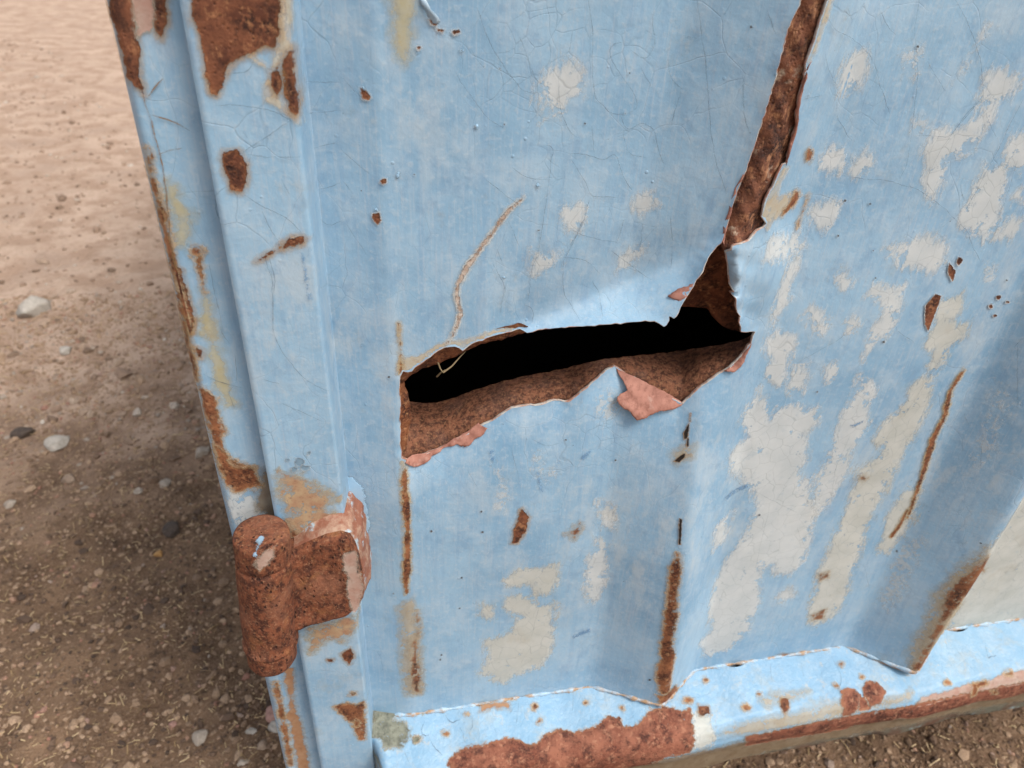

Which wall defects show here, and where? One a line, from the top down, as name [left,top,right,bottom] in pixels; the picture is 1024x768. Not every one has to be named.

corrosion [191,0,303,119]
peeling [808,198,841,230]
peeling [819,144,873,177]
peeling [921,67,1020,200]
peeling [958,132,1024,245]
corrosion [142,144,342,538]
corrosion [394,0,831,695]
peeling [699,231,969,656]
corrosion [889,370,966,538]
corrosion [305,608,360,664]
peeling [480,563,560,685]
corrosion [447,547,1024,768]